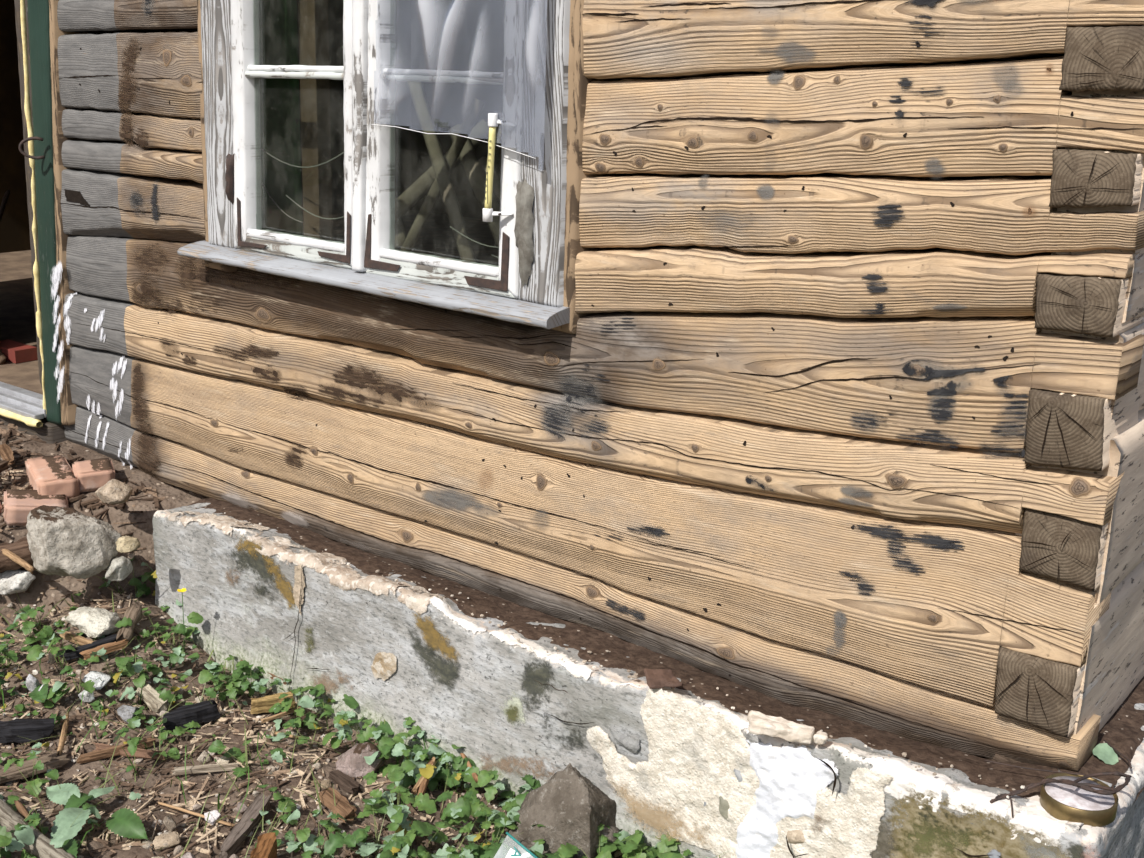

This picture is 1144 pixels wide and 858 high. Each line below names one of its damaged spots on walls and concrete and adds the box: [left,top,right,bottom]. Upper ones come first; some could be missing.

crack [394,329,697,366]
crack [733,358,925,393]
peeling [293,564,305,614]
water stain [166,494,593,727]
crack [162,462,1021,756]
water stain [558,713,584,749]
spalling [586,689,892,858]
water stain [870,755,1094,858]